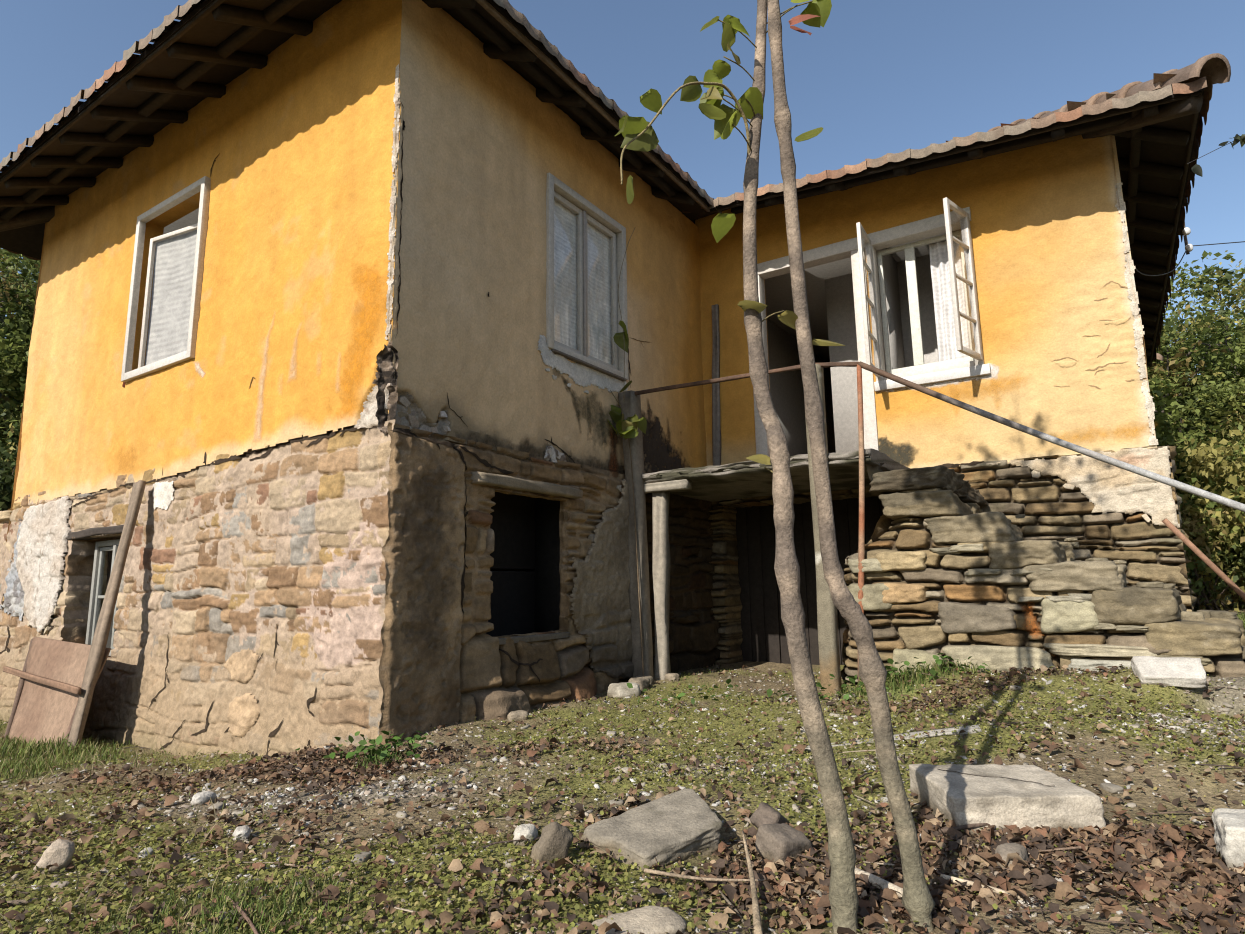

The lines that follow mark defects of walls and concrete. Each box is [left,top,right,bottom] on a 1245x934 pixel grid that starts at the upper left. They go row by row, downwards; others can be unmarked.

spalling [354,64,451,437]
peeling [538,335,628,394]
damp [469,433,551,461]
damp [556,370,625,474]
damp [641,401,690,473]
peeling [153,480,175,510]
crack [70,393,514,614]
flaking render [0,496,72,635]
crack [0,594,24,654]
crack [149,635,169,707]
crack [159,701,229,750]
crack [267,688,316,752]